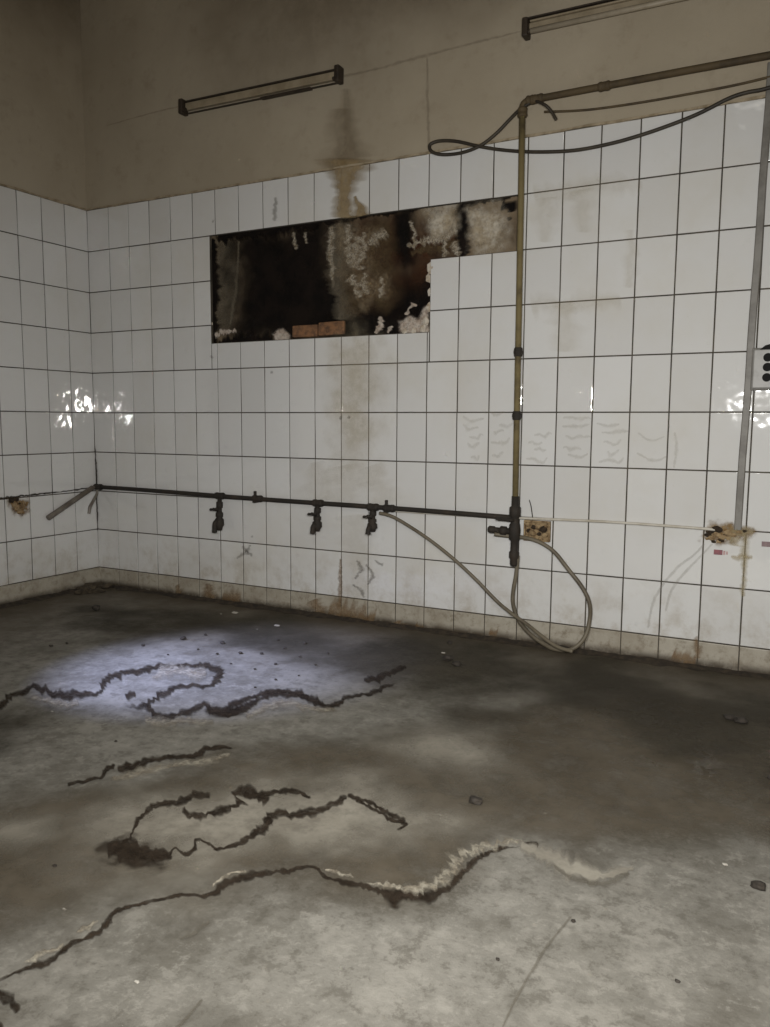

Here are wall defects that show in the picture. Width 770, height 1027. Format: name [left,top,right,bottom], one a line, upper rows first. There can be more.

damp [328,158,367,218]
spalling [212,196,518,343]
spalling [8,497,29,516]
spalling [704,523,756,544]
crack [0,662,406,786]